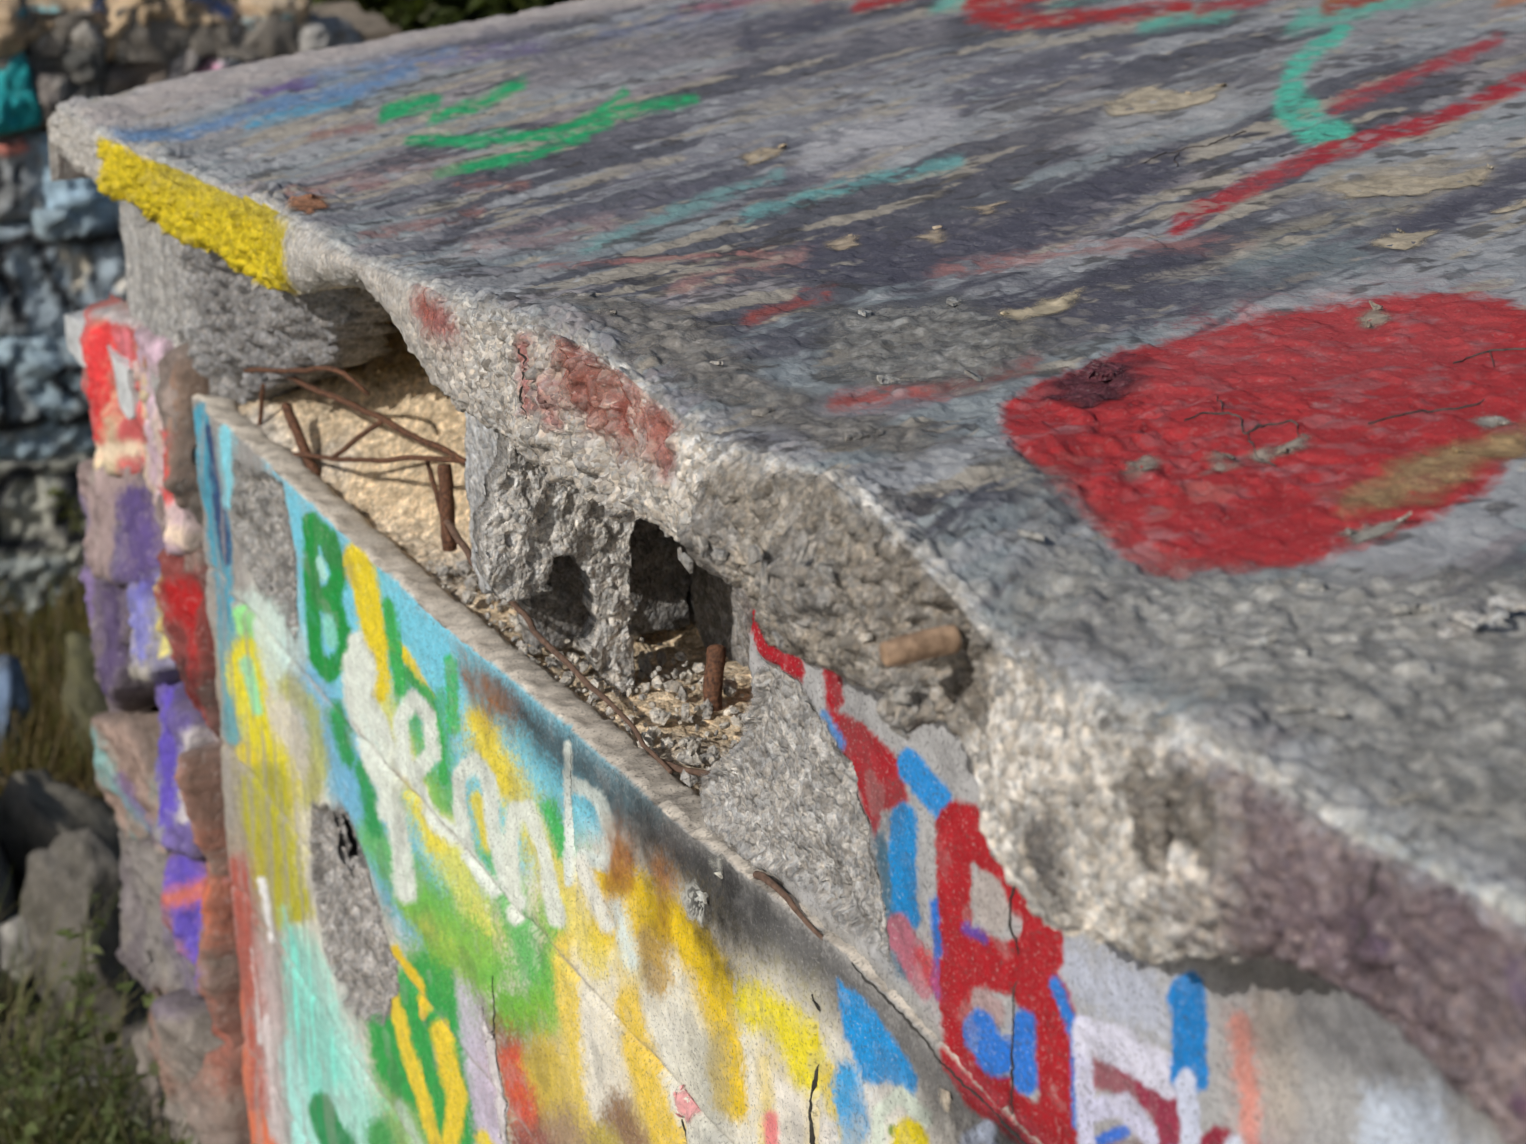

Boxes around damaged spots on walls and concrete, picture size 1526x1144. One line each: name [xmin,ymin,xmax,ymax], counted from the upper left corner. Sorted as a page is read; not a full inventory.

spalling [230,462,299,638]
spalling [281,402,321,478]
spalling [437,464,457,552]
spalling [560,292,933,453]
spalling [309,806,400,1023]
crack [811,994,821,1012]
crack [851,887,1026,1144]
crack [808,1065,819,1144]